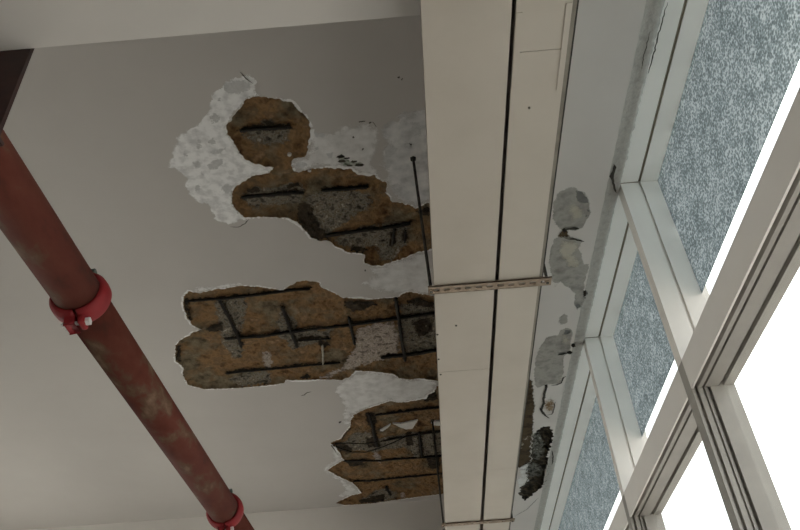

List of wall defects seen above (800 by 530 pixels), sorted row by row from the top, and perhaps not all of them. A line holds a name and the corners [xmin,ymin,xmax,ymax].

spalling [169,74,443,506]
peeling [534,314,576,387]
peeling [548,187,591,309]